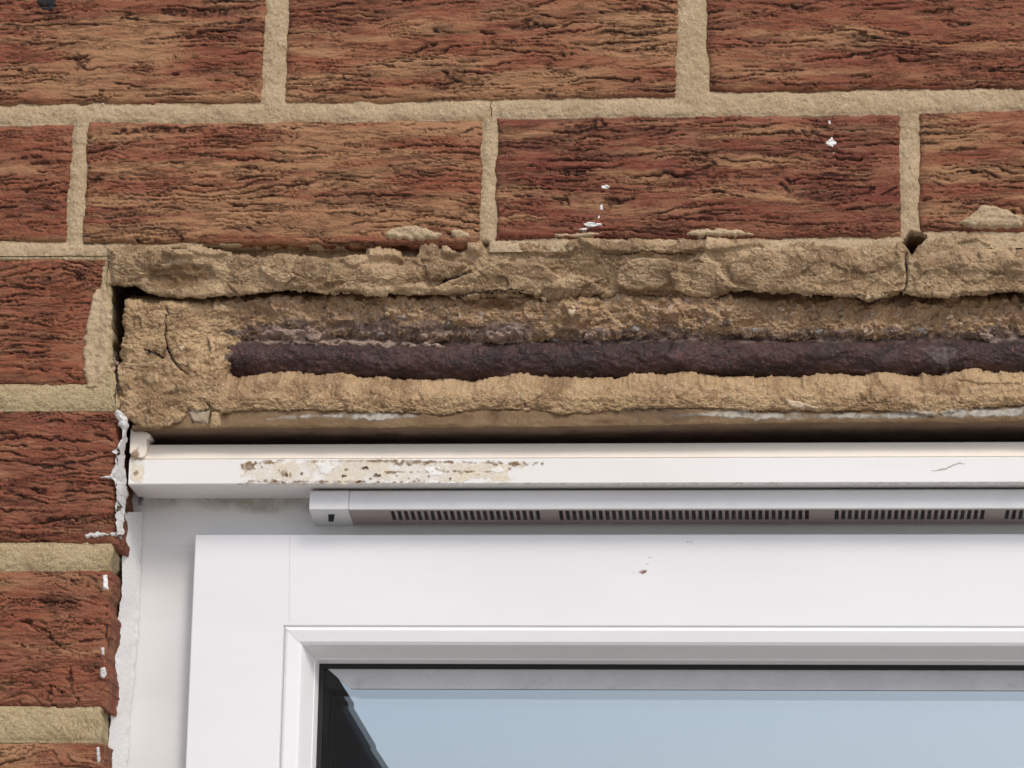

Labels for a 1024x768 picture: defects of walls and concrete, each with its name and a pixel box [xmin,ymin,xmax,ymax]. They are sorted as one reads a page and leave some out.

crack [144,310,191,372]
spalling [117,291,1024,431]